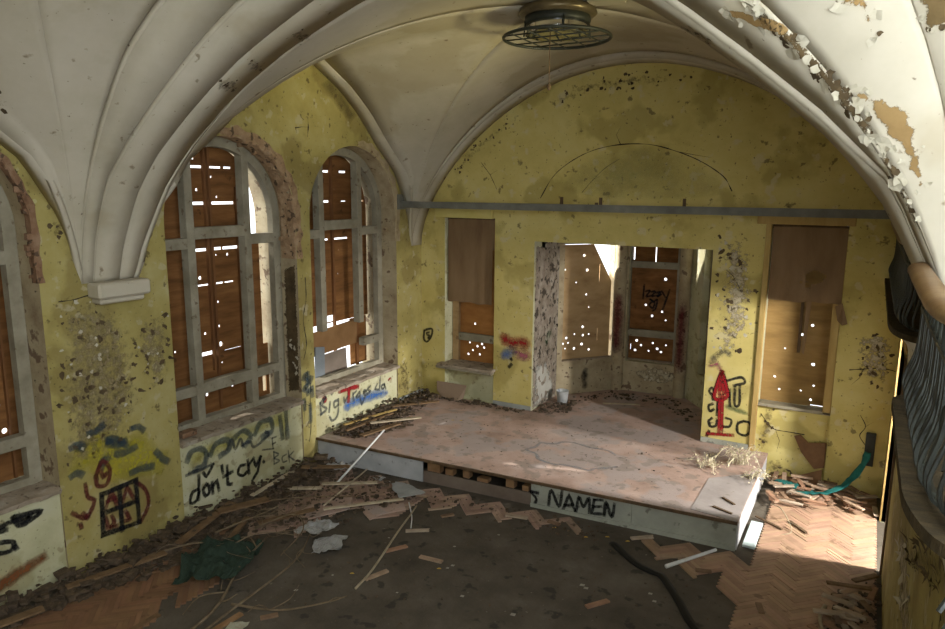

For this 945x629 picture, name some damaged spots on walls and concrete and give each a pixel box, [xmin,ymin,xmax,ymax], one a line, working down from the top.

peeling [915,0,945,33]
crack [540,134,732,198]
spalling [719,0,933,234]
peeling [56,300,175,467]
spalling [532,246,557,408]
peeling [710,234,759,354]
peeling [859,333,895,389]